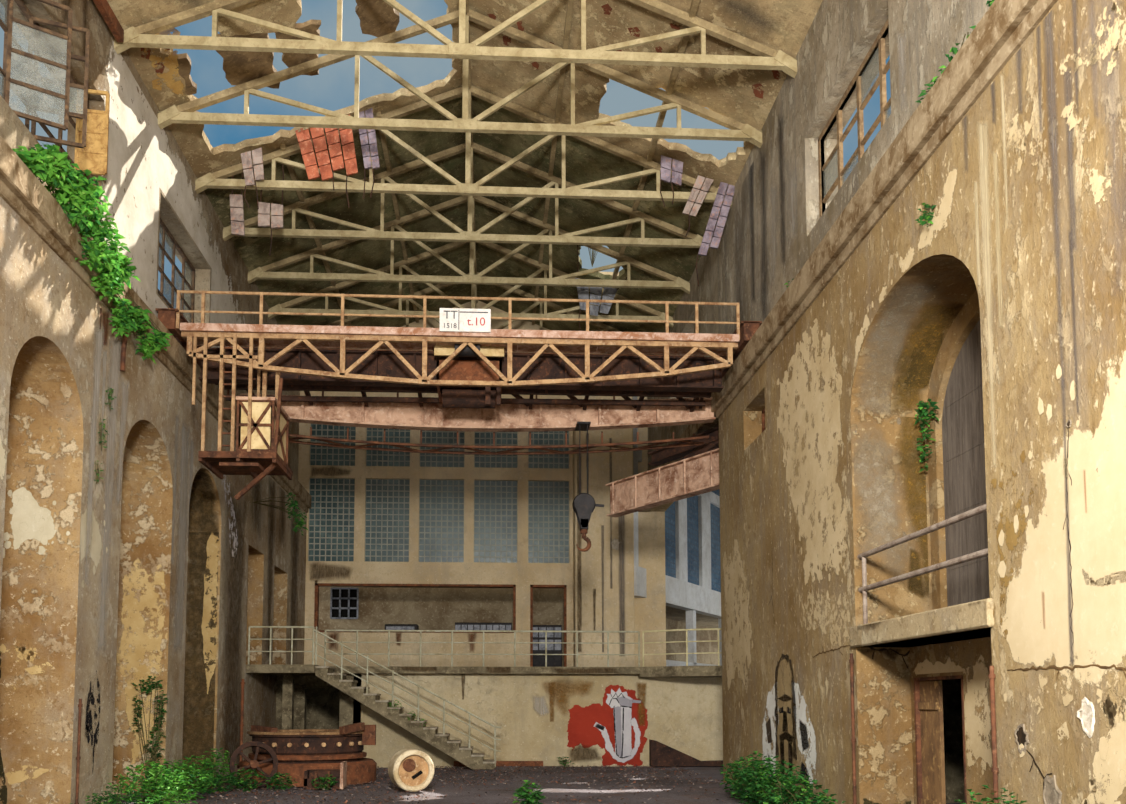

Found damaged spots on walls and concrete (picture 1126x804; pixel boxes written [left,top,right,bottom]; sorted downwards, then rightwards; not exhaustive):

peeling [1059,0,1126,76]
peeling [1006,106,1040,173]
peeling [1061,100,1082,130]
peeling [1089,167,1111,204]
water stain [975,76,1008,464]
water stain [1037,0,1078,662]
peeling [776,163,962,649]
peeling [990,350,1126,804]
crack [1007,424,1126,678]
peeling [0,642,54,675]
peeling [5,765,49,785]